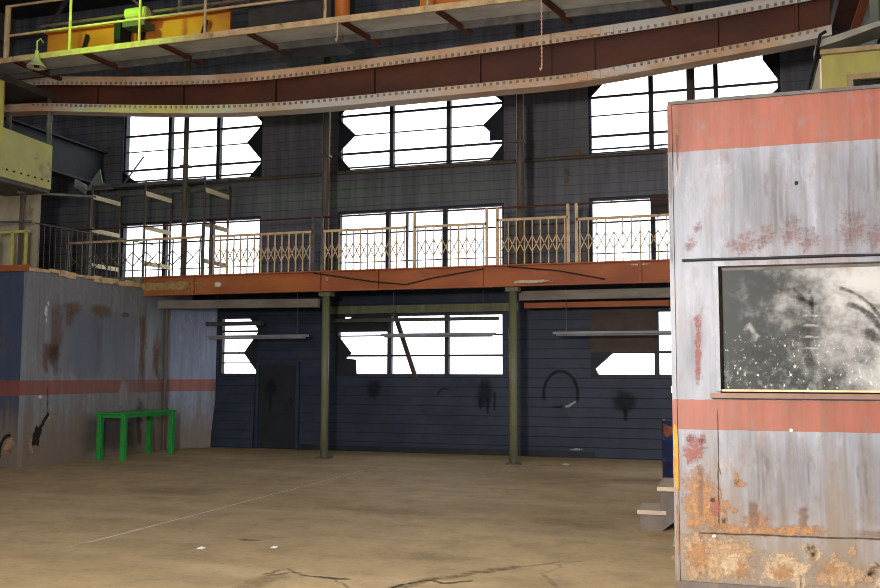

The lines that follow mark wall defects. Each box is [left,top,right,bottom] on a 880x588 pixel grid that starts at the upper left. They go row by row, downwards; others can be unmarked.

corrosion [43,304,79,372]
corrosion [673,423,823,555]
crack [390,566,518,588]
peeling [674,530,880,588]